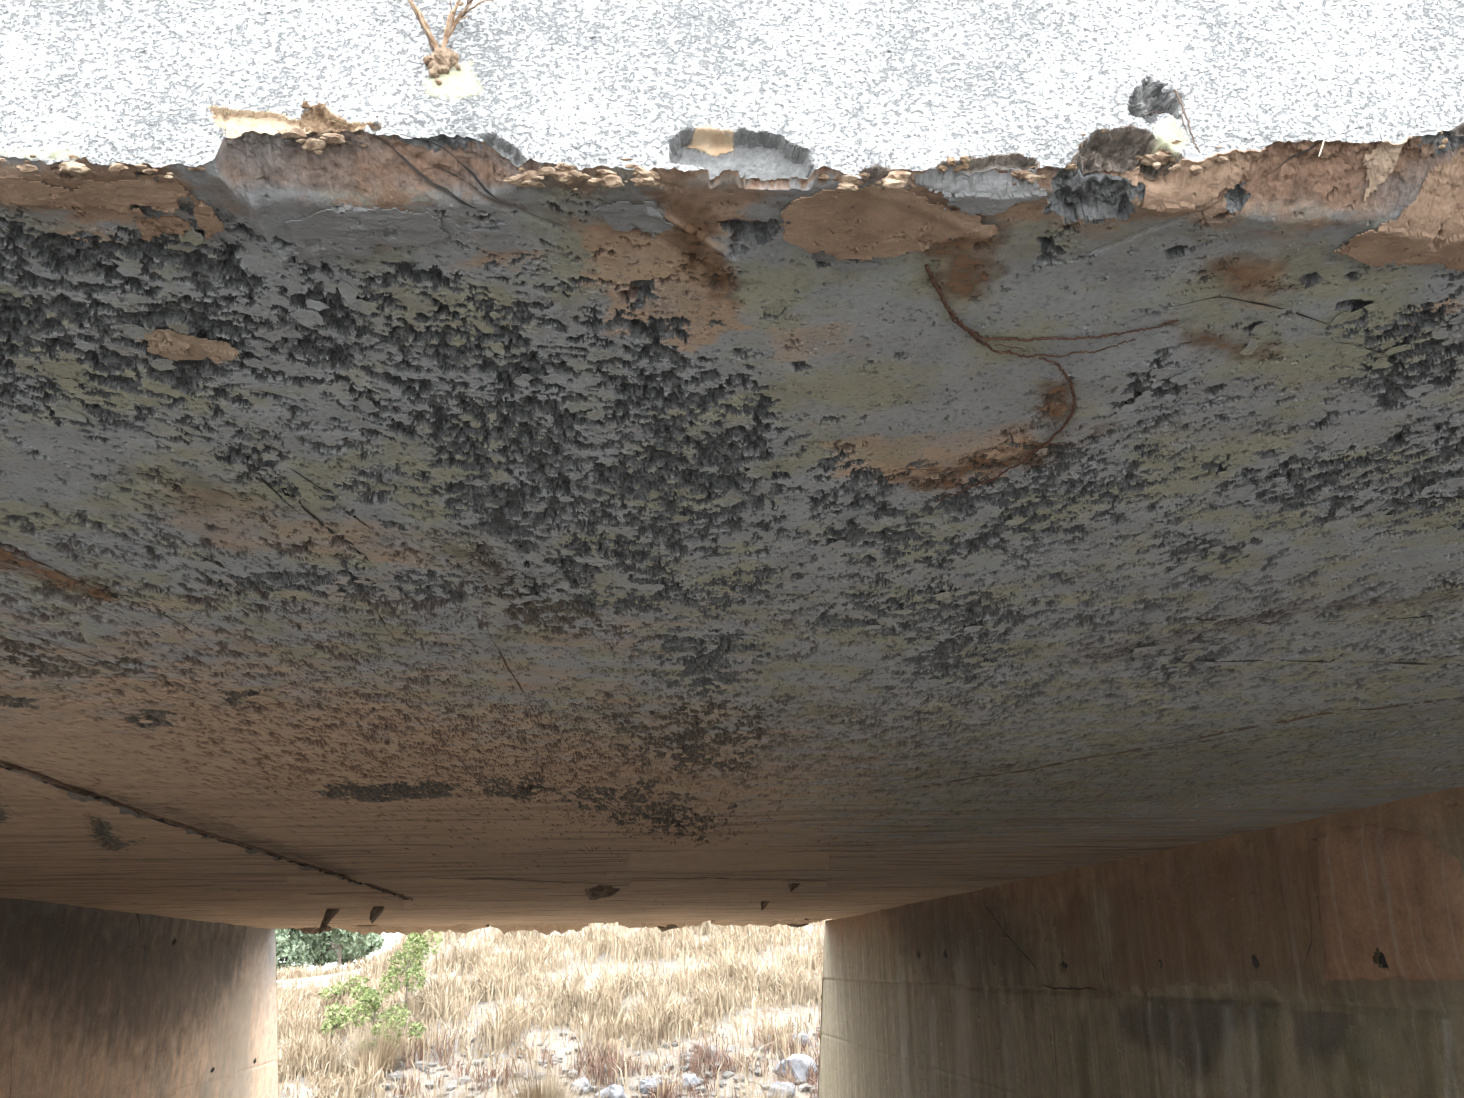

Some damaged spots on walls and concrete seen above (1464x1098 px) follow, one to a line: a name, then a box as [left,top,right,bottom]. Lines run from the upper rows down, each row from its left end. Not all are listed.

spalling [0,155,38,174]
spalling [59,154,206,182]
spalling [208,100,911,191]
spalling [934,75,1229,255]
spalling [1417,122,1464,159]
spalling [1224,182,1251,213]
peeling [0,199,1464,841]
spalling [82,813,147,851]